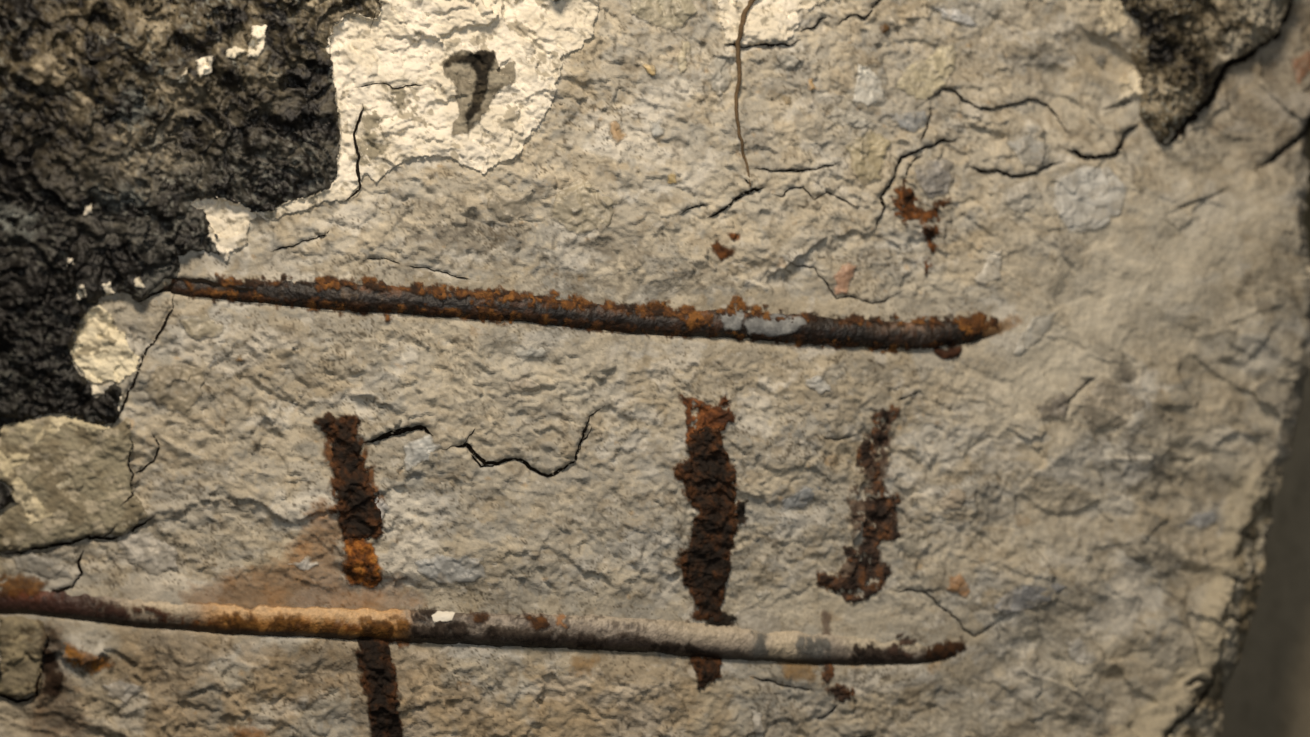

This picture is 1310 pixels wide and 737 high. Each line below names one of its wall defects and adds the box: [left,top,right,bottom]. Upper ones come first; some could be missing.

peeling [257,0,599,220]
crack [680,0,1310,230]
leakage [0,208,32,233]
peeling [191,196,257,262]
rust [891,180,951,275]
spalling [1052,166,1127,233]
peeling [70,305,140,398]
rust [186,273,999,359]
crack [364,407,603,477]
rust [342,538,382,589]
rust [360,607,705,654]
spalling [0,614,373,737]